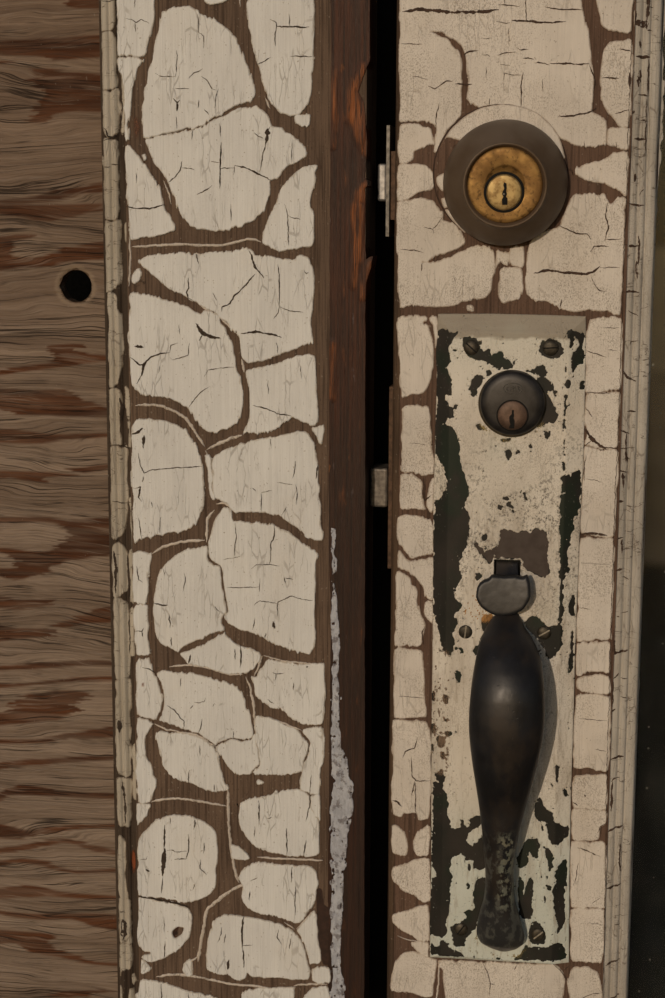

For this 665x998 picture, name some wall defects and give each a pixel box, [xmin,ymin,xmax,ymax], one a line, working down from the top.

crack [103,0,329,998]
peeling [101,0,354,998]
peeling [390,0,635,998]
crack [393,0,653,998]